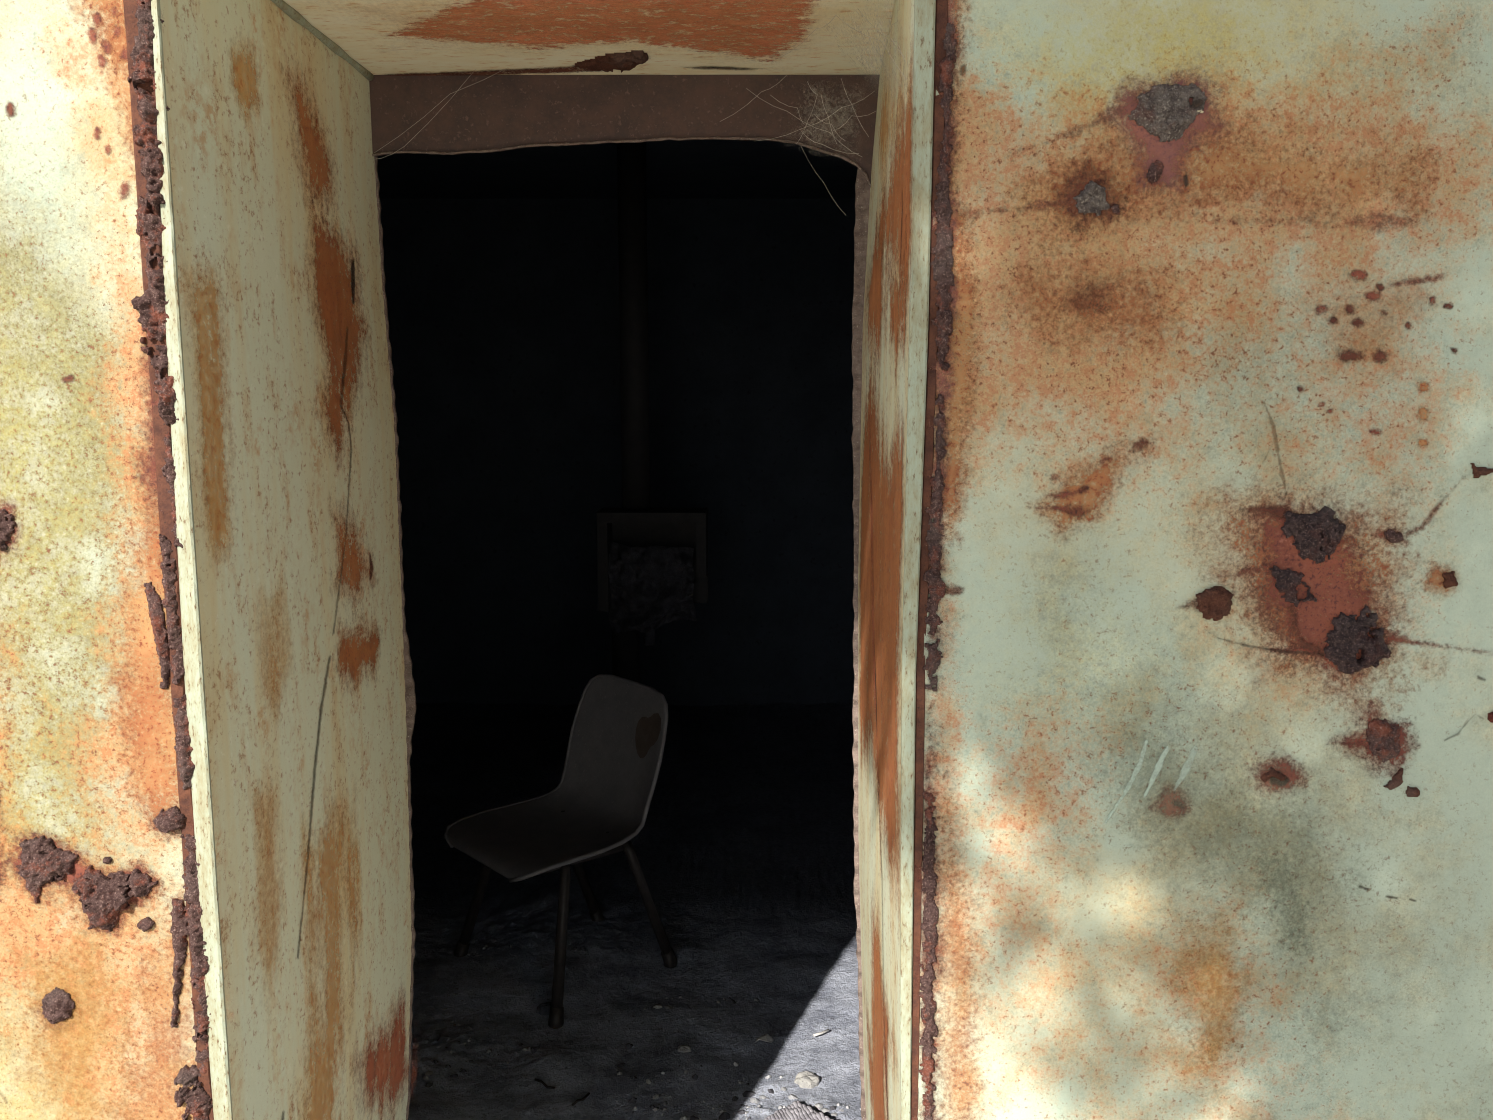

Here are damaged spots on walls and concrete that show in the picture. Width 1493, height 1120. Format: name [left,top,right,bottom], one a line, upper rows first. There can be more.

rust [0,0,213,1120]
rust [193,273,230,555]
rust [287,75,368,458]
rust [389,0,818,62]
rust [859,74,913,881]
rust [917,0,983,1120]
rust [1036,438,1154,534]
rust [1000,72,1437,241]
rust [1184,493,1480,797]
rust [1316,270,1453,327]
rust [355,998,417,1114]
rust [866,901,894,1120]